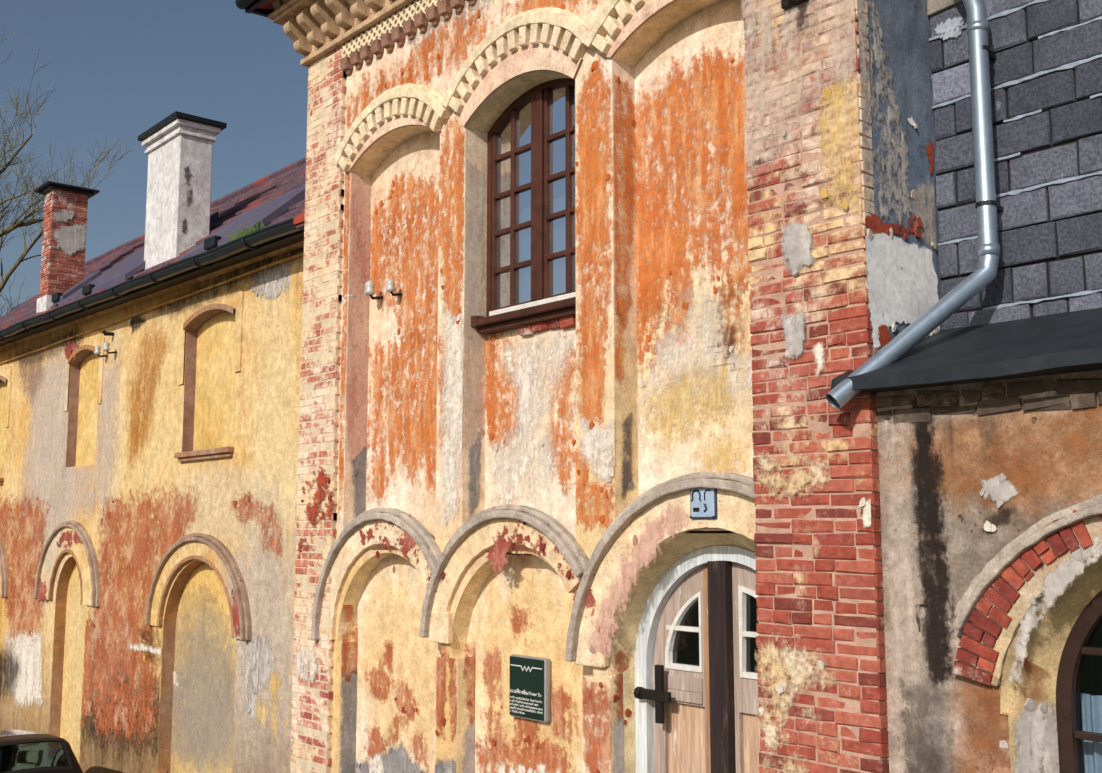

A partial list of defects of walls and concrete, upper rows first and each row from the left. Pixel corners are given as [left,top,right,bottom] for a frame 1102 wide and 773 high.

flaking render [53,210,87,256]
peeling [298,46,753,592]
flaking render [780,310,805,359]
flaking render [781,222,815,276]
flaking render [819,73,939,348]
peeling [0,360,197,753]
peeling [232,492,283,557]
flaking render [341,604,419,773]
peeling [435,505,688,773]
leakage [883,398,954,773]
flaking render [979,473,1018,532]
flaking render [1009,537,1102,683]